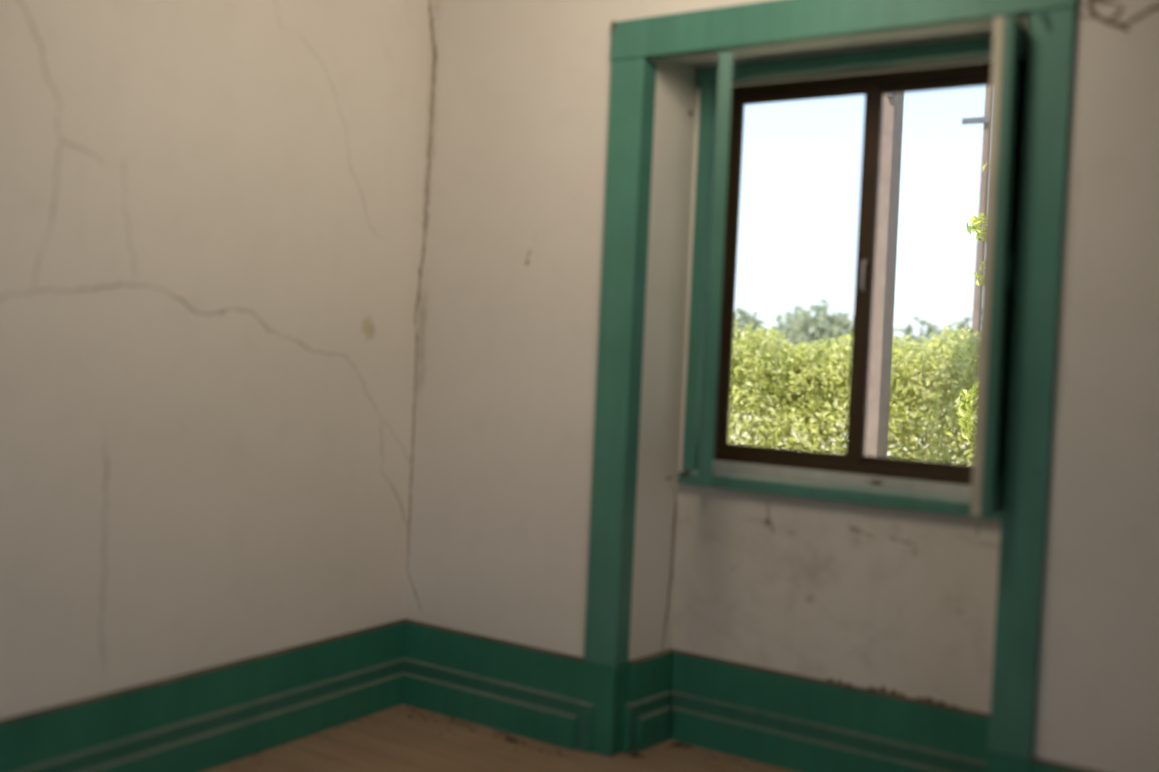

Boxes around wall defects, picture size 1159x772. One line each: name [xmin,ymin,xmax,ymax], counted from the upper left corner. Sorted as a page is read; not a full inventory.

crack [407,0,437,611]
crack [1076,0,1159,32]